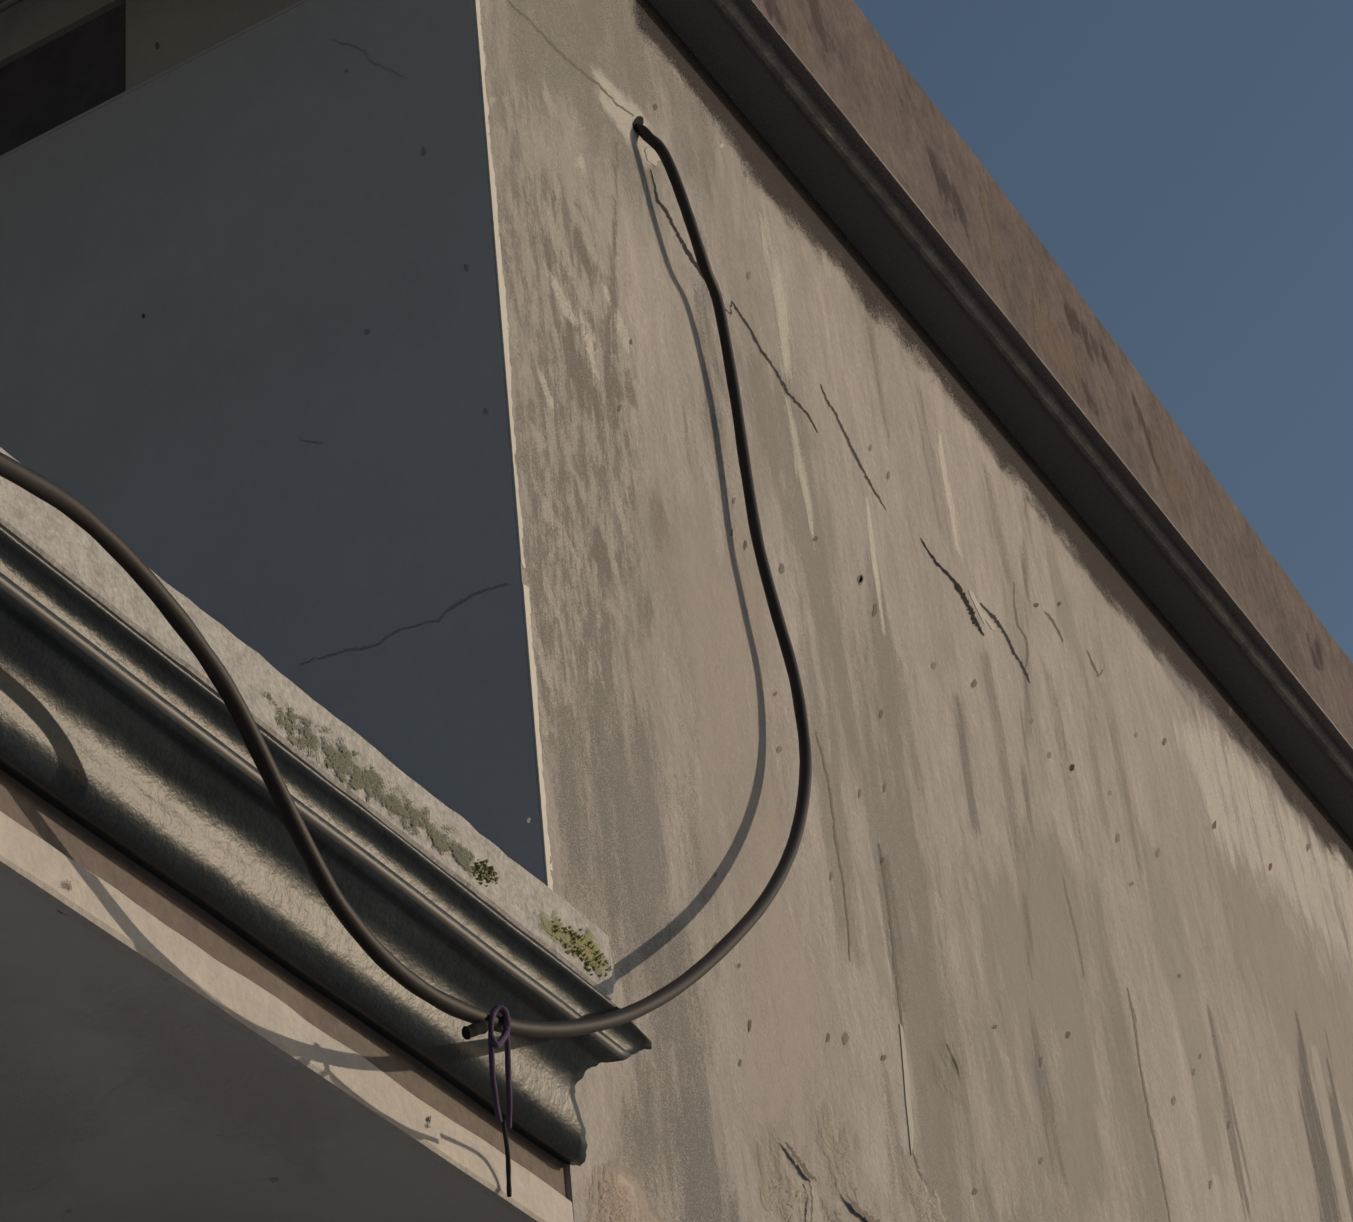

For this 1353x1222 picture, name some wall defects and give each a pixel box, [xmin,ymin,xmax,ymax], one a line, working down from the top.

crack [507,0,634,116]
crack [651,170,703,279]
crack [725,302,886,510]
crack [299,583,508,665]
leakage [480,0,1353,1222]
crack [920,538,1104,683]